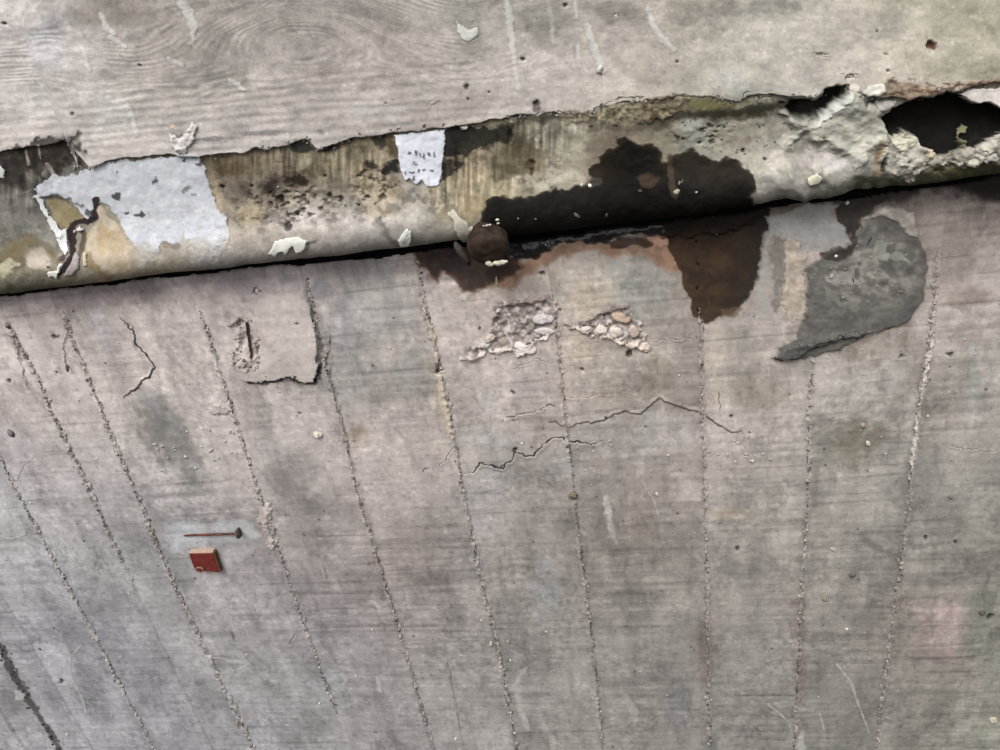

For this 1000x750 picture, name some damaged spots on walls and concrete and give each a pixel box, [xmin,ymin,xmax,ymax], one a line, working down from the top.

peeling [31,122,230,282]
damp [284,135,356,154]
damp [355,132,401,191]
damp [485,222,667,267]
rust [412,207,771,325]
spalling [745,85,849,119]
damp [751,127,1000,323]
spalling [862,75,1000,154]
crack [117,316,156,398]
flaking render [227,281,331,385]
spalling [459,292,653,363]
crack [422,391,744,477]